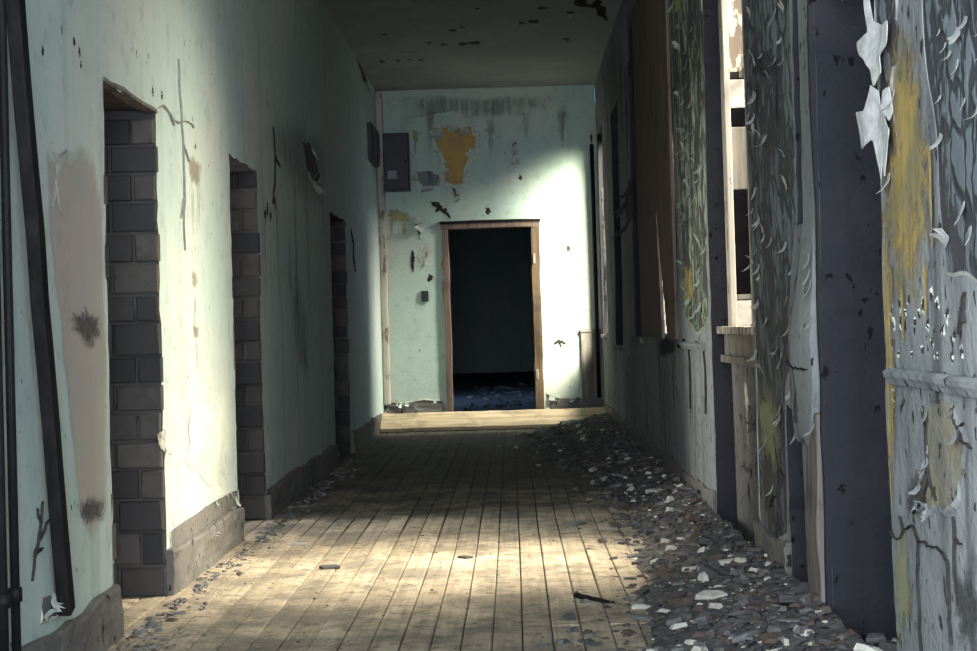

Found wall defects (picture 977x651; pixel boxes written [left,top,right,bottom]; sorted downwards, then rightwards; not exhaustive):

crack [158,59,194,251]
peeling [411,121,481,203]
peeling [729,0,796,541]
peeling [856,0,899,202]
leakage [883,33,933,340]
peeling [922,0,977,283]
crack [769,434,785,538]
crack [889,391,972,651]
spalling [907,392,968,522]